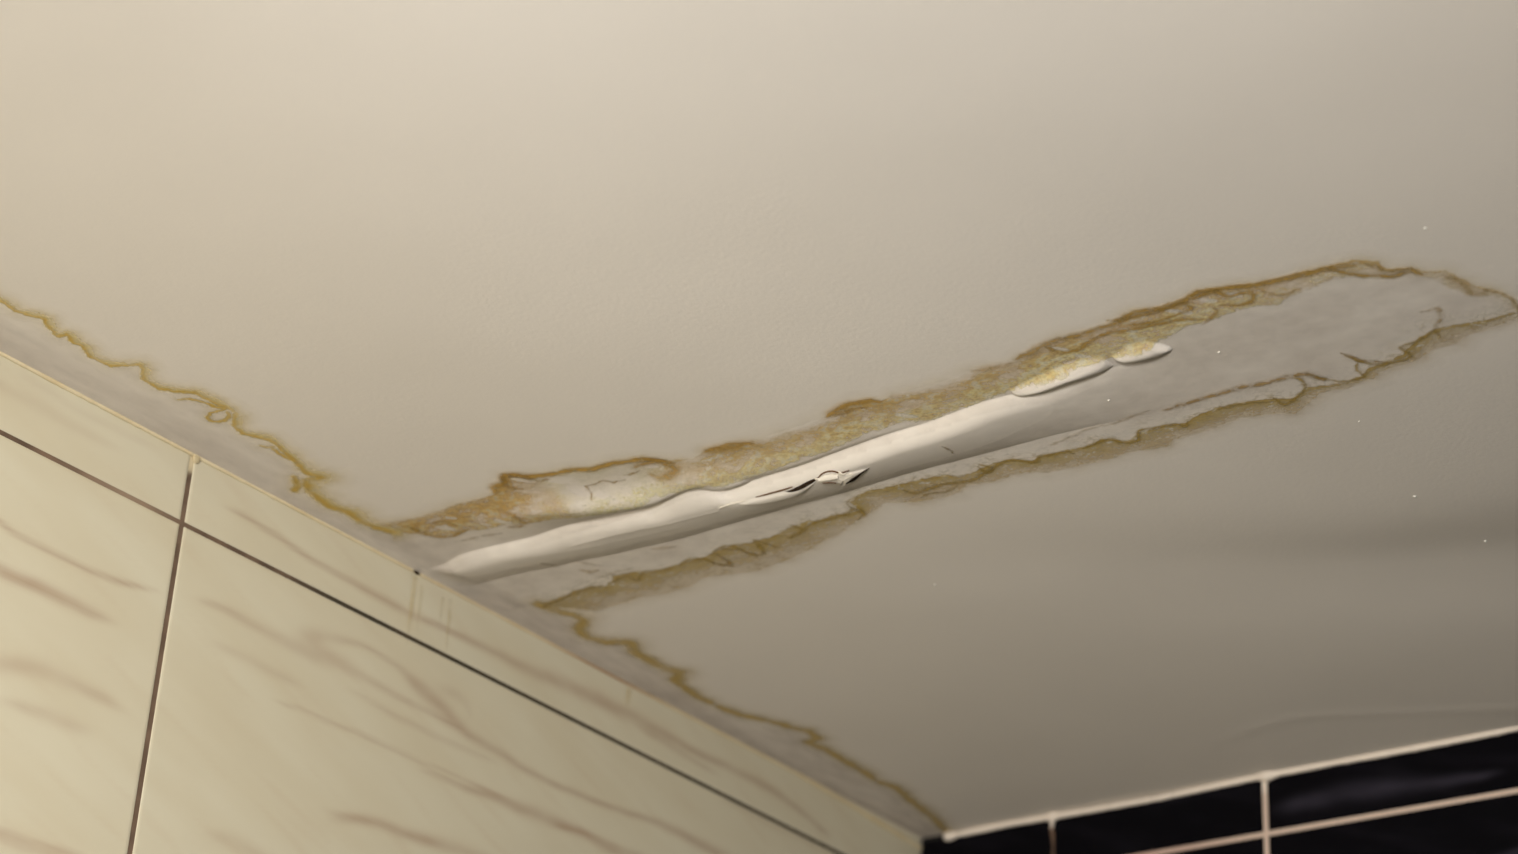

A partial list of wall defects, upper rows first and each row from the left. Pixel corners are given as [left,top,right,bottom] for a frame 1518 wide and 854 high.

damp [0,260,1442,538]
crack [719,468,869,509]
damp [533,313,1515,831]